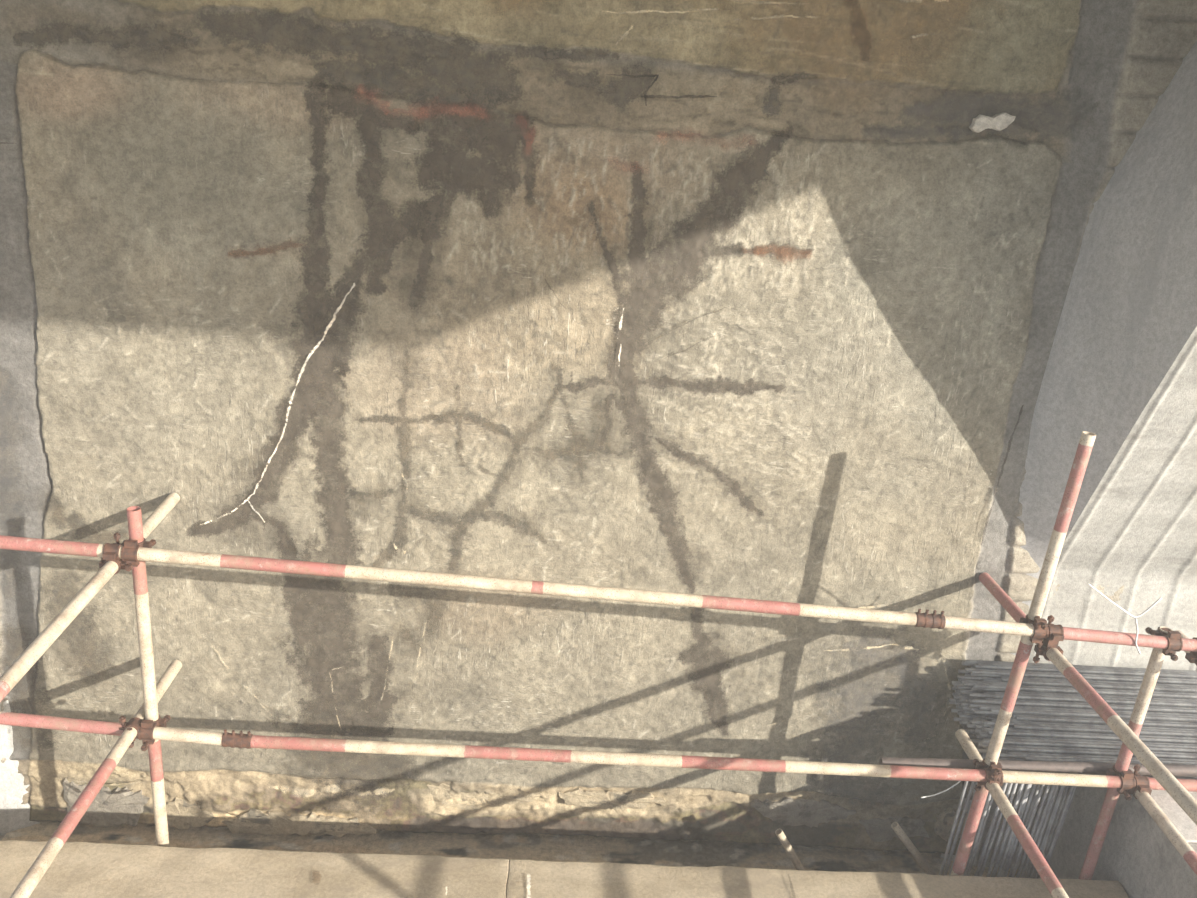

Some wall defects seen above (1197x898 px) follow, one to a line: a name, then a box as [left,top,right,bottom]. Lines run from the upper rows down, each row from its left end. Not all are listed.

damp [873,91,1096,141]
damp [0,368,27,598]
damp [10,5,817,814]
damp [0,624,29,671]